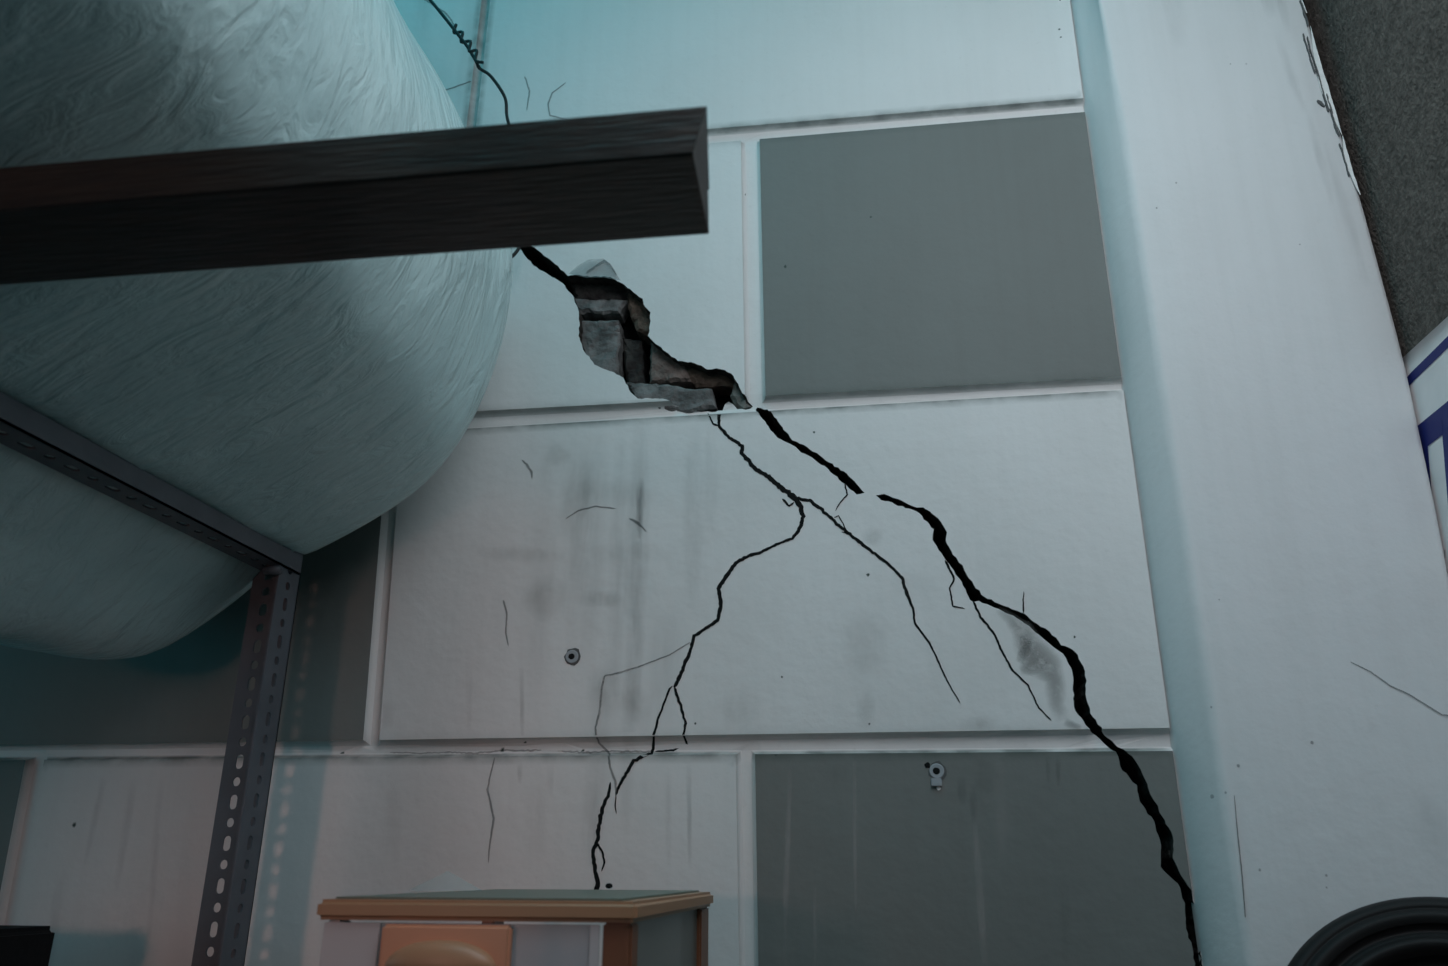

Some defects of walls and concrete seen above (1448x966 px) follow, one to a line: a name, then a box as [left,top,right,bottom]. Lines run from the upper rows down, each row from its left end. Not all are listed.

spalling [521,246,753,413]
crack [591,408,1202,966]